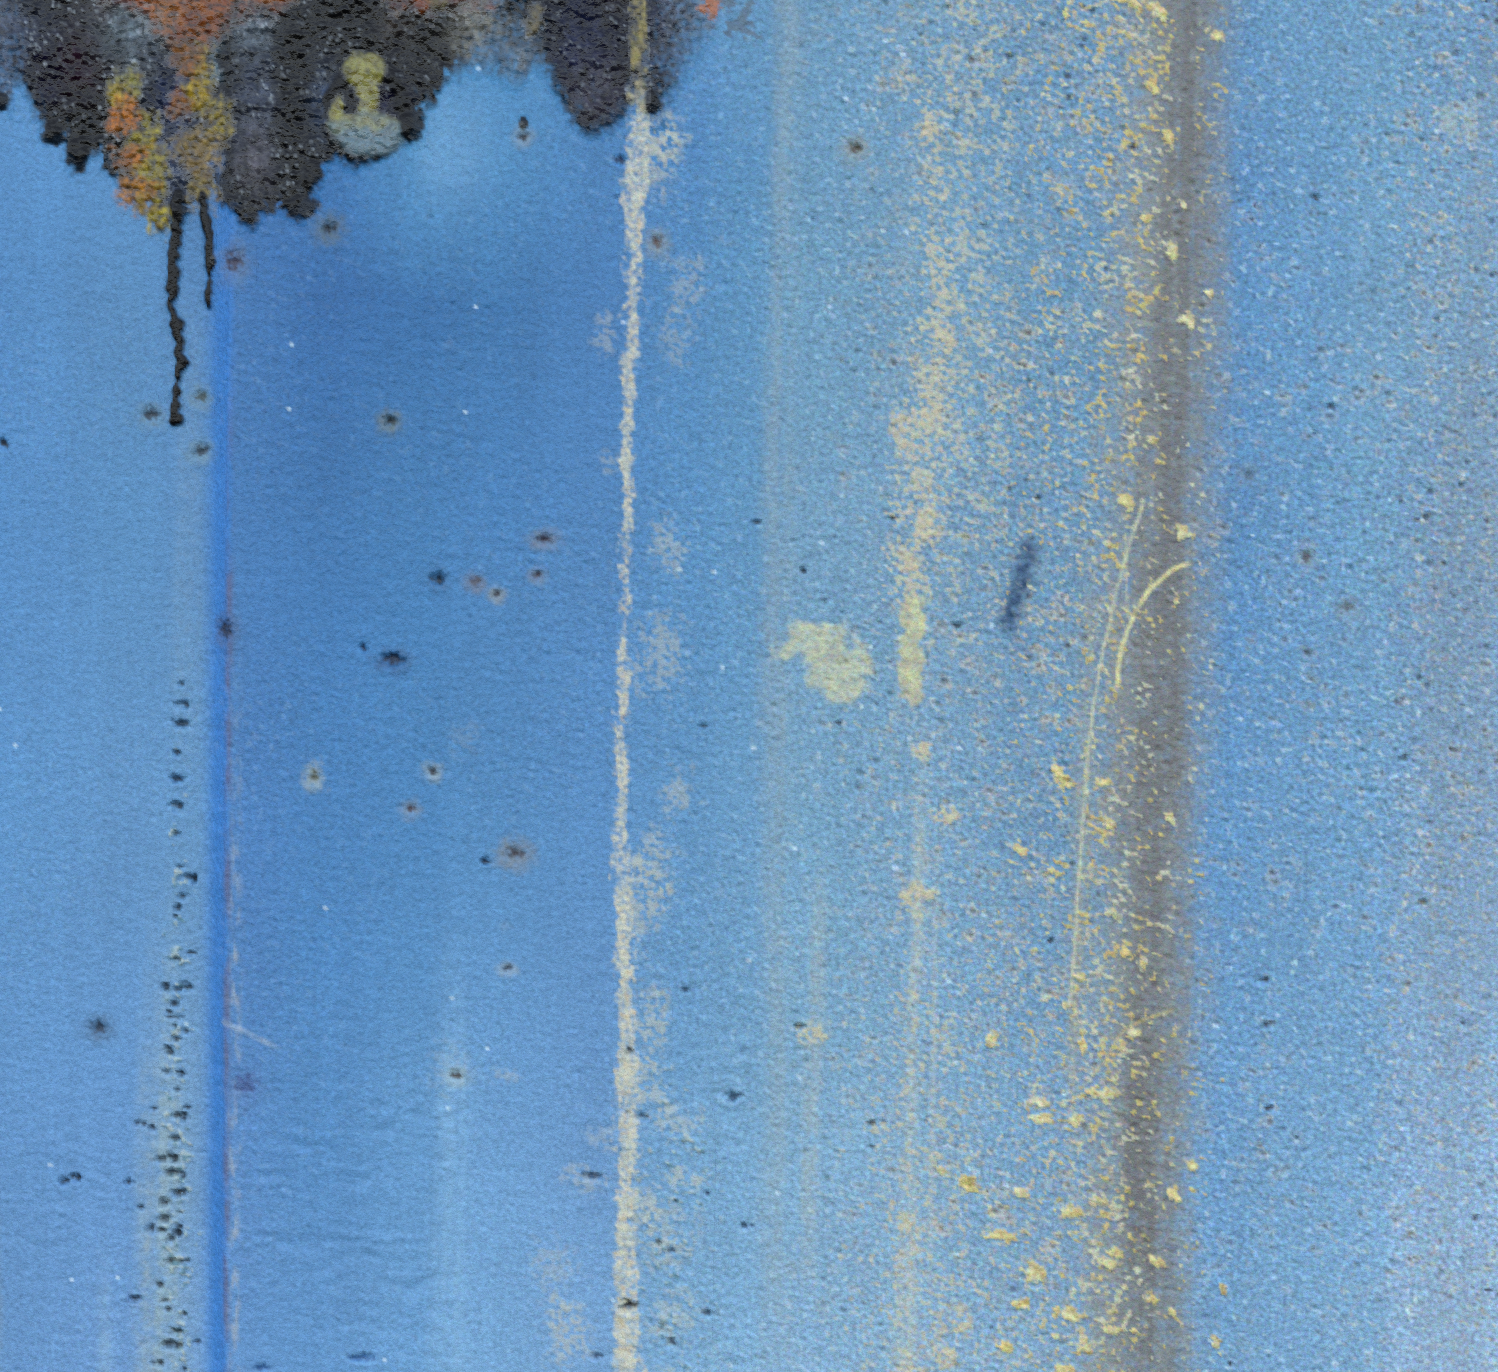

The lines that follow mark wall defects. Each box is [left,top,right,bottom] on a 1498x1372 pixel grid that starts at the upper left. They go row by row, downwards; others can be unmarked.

corrosion [0,0,630,429]
corrosion [649,0,765,135]